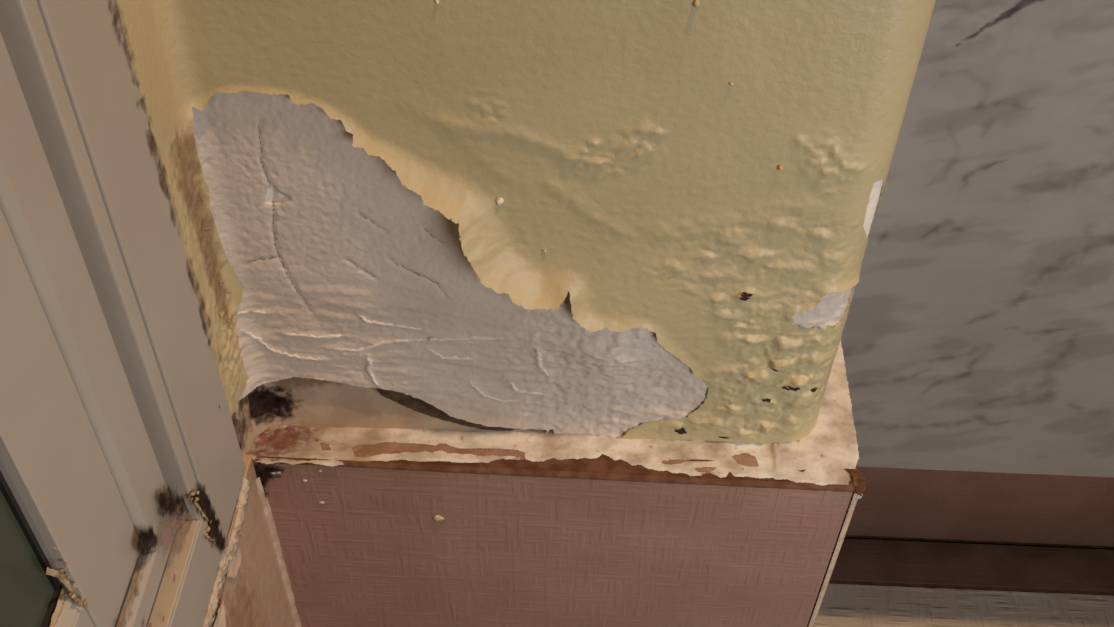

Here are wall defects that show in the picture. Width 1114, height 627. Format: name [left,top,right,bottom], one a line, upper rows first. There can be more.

peeling [170,61,724,460]
water stain [233,377,330,496]
mould [137,527,158,556]
mould [159,485,236,554]
spalling [849,470,867,500]